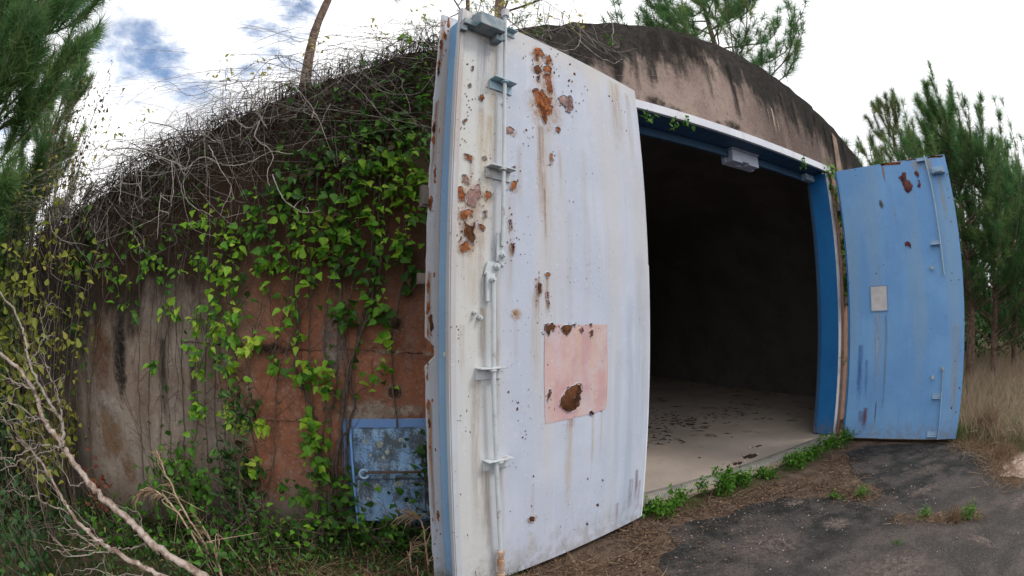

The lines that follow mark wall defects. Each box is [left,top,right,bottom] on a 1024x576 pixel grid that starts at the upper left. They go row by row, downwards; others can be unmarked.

rust [514,38,588,133]
leakage [716,64,740,130]
rust [457,60,495,253]
rust [880,155,943,193]
rust [535,272,599,338]
leakage [113,303,125,389]
rust [545,382,602,417]